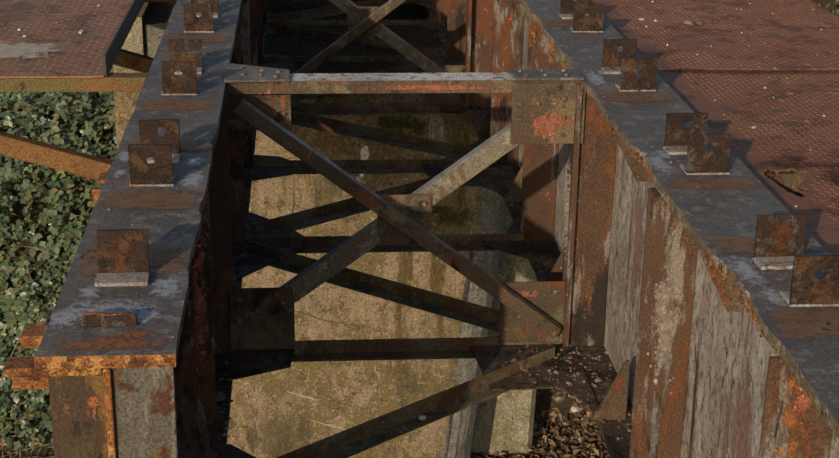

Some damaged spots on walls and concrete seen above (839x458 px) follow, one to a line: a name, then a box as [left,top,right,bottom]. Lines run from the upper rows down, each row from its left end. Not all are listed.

corrosion [57,331,165,352]
corrosion [150,375,173,416]
corrosion [681,330,703,458]